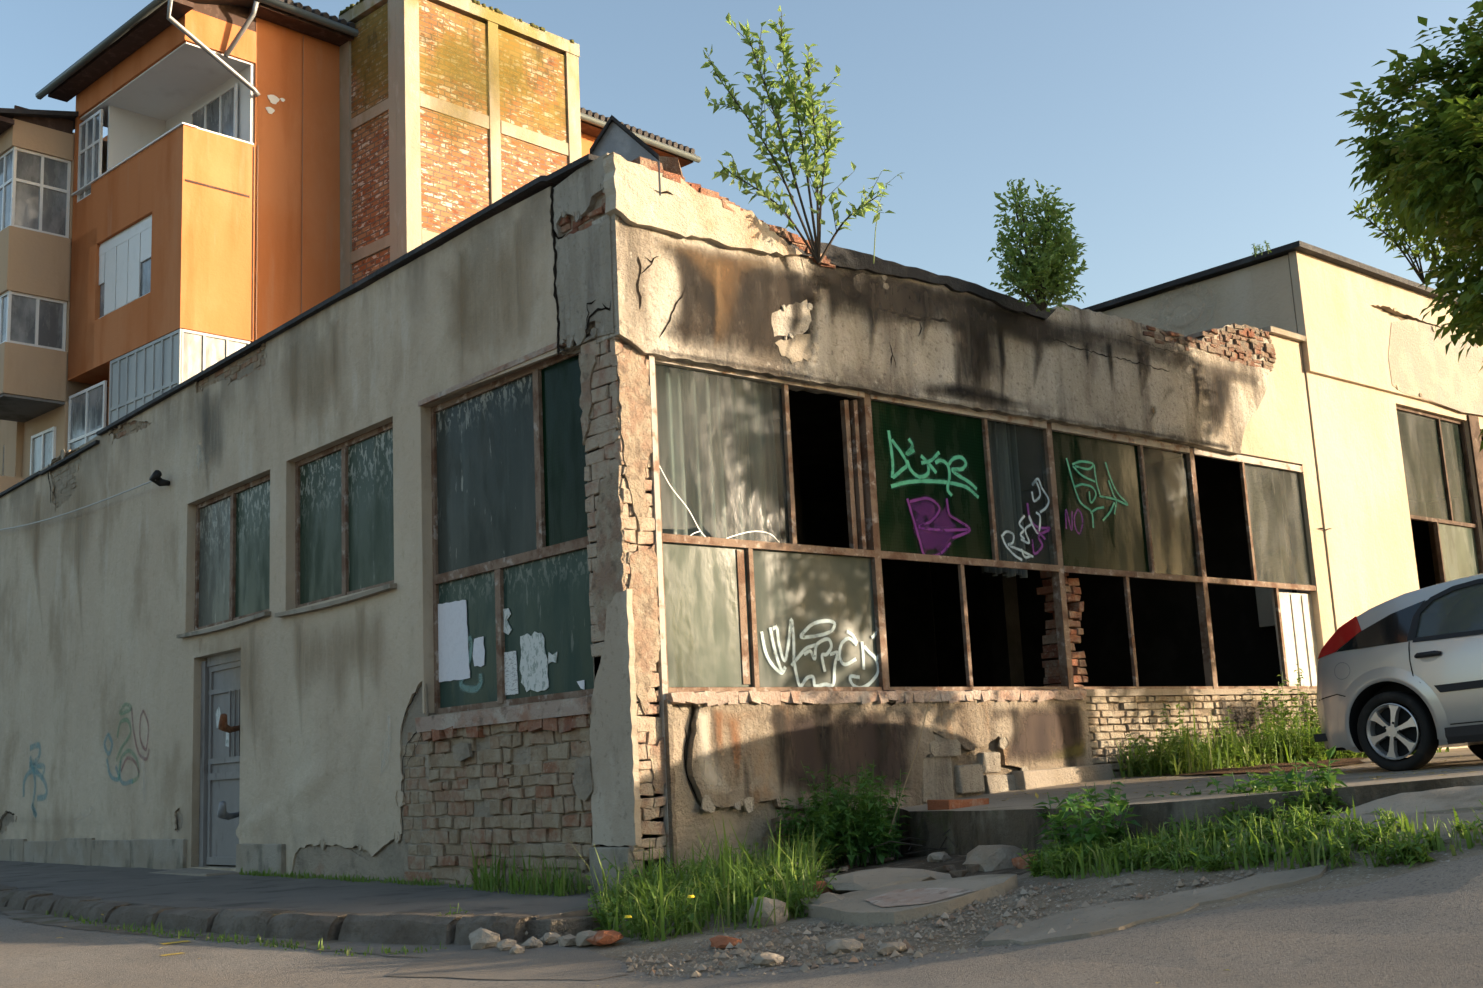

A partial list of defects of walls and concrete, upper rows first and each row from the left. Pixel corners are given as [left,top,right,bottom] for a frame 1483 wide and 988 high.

spalling [559,175,622,238]
crack [550,187,684,354]
peeling [771,299,813,364]
water stain [673,249,1247,448]
flaking render [560,328,656,657]
spalling [293,684,597,891]
spalling [629,663,901,876]
spalling [922,734,1029,804]